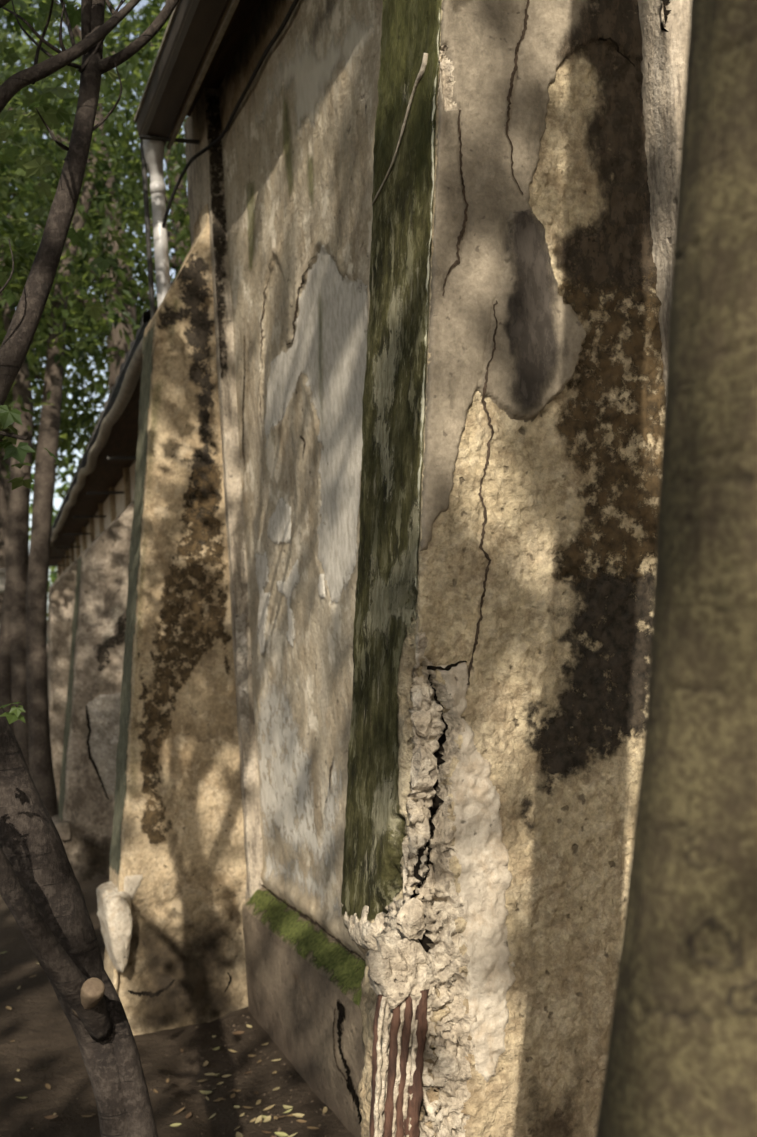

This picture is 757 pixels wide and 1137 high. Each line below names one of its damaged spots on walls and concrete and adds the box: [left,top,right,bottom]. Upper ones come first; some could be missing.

leakage [262,0,371,188]
crack [506,0,530,195]
crack [663,0,671,28]
crack [442,110,469,296]
leakage [135,93,231,844]
peeling [264,244,367,604]
leakage [504,0,665,795]
leakage [94,616,126,671]
peeling [234,497,300,735]
spalling [341,620,516,1137]
leakage [521,798,534,830]
crack [333,999,362,1123]